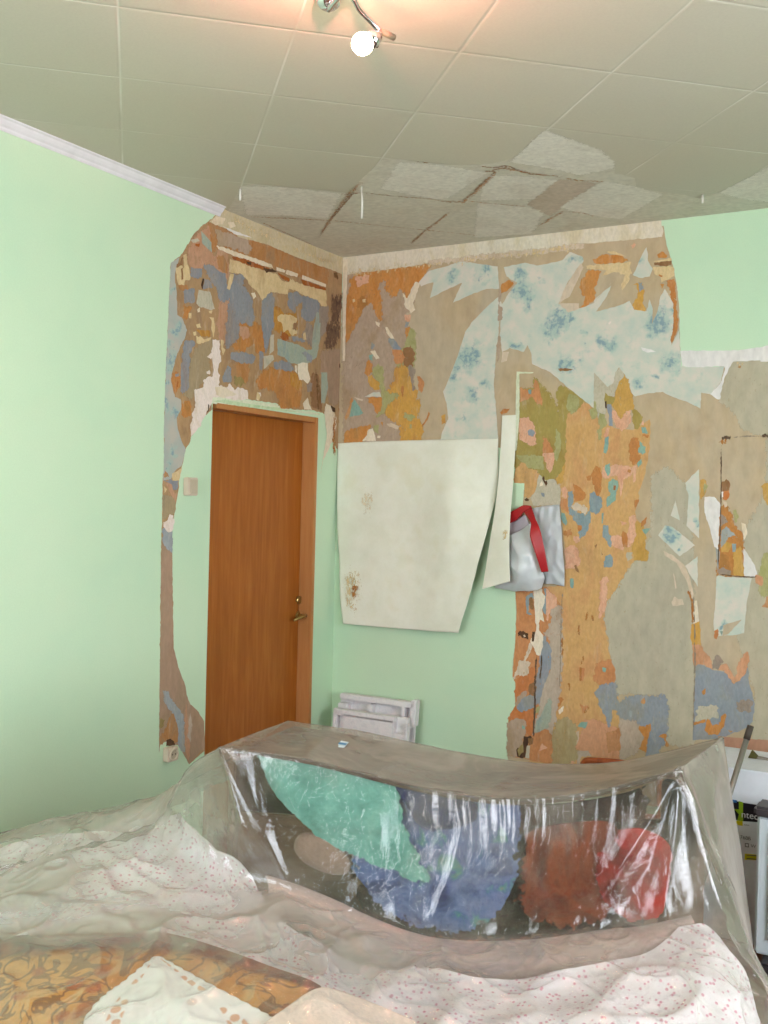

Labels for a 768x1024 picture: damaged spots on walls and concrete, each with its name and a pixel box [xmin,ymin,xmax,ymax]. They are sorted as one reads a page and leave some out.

flaking render [176,254,204,289]
damp [234,186,441,279]
flaking render [209,130,768,469]
damp [401,165,602,243]
flaking render [189,308,261,436]
peeling [506,368,670,764]
peeling [700,479,708,499]
peeling [716,479,768,608]
peeling [690,622,768,752]